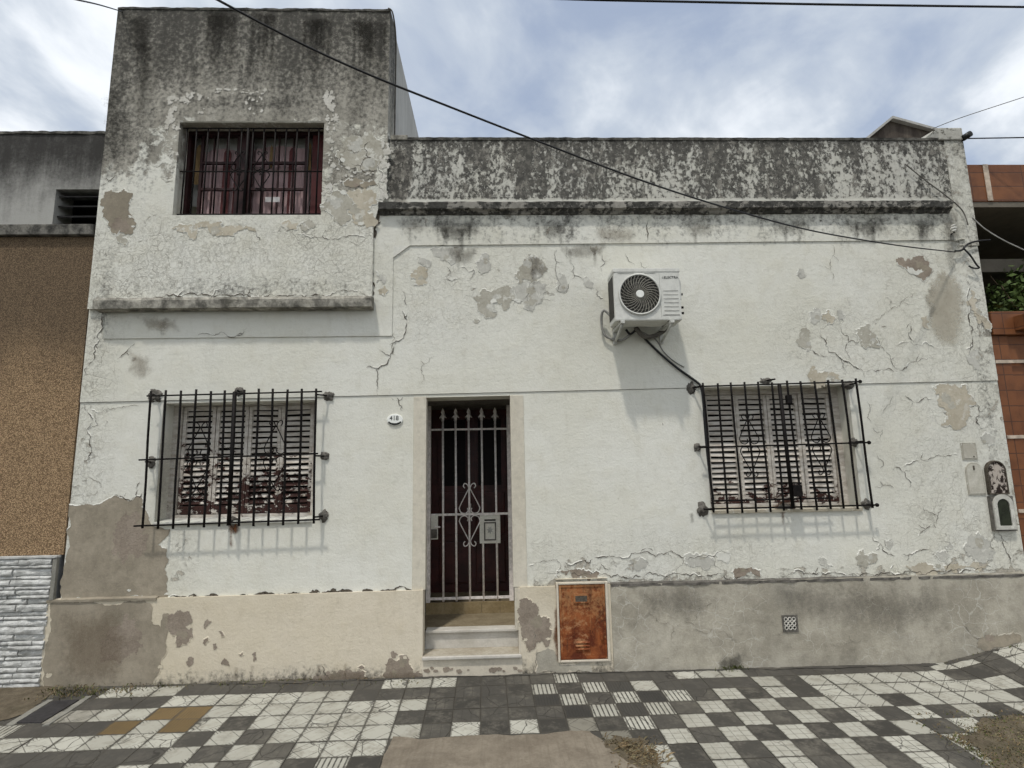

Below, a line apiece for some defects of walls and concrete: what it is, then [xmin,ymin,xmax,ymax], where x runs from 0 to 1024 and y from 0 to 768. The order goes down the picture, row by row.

flaking render [320,90,393,228]
flaking render [100,188,136,247]
peeling [472,252,568,324]
peeling [896,256,932,282]
crack [370,293,409,410]
crack [813,294,956,488]
flaking render [932,383,977,430]
crack [84,404,142,501]
flaking render [42,494,256,688]
flaking render [517,597,553,652]
peeling [555,568,600,581]
peeling [731,567,761,579]